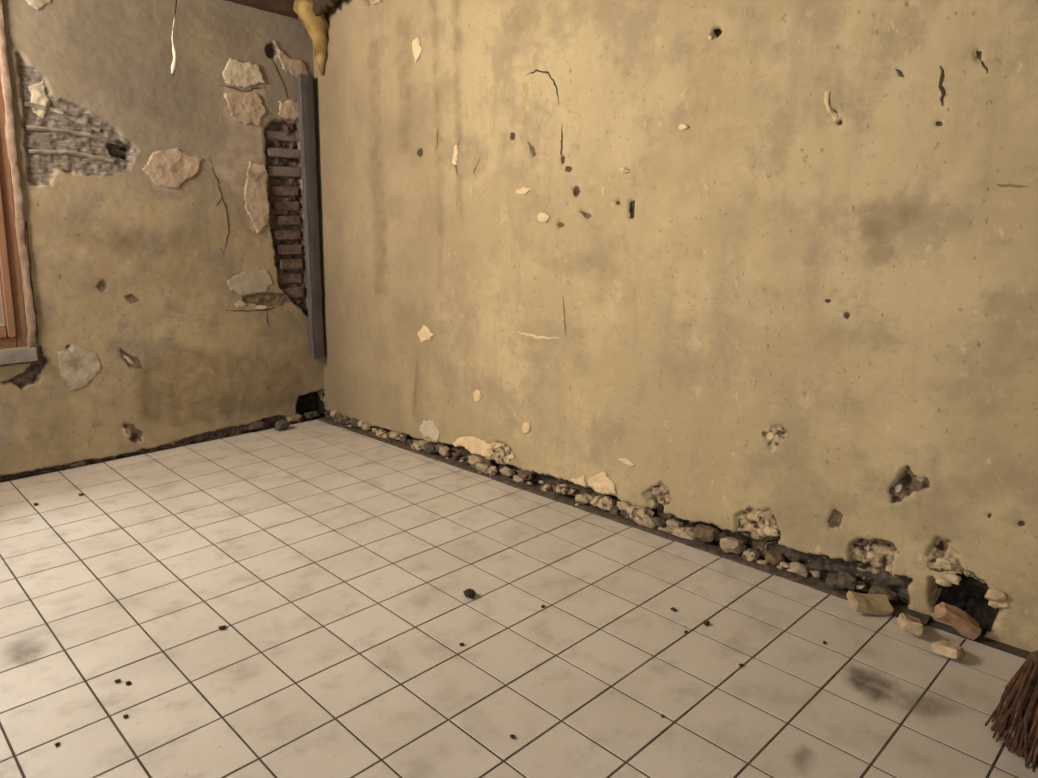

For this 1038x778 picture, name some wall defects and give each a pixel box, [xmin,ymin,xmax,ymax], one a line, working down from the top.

peeling [17,40,310,326]
peeling [3,344,101,392]
spalling [121,349,144,370]
spalling [0,392,1011,640]